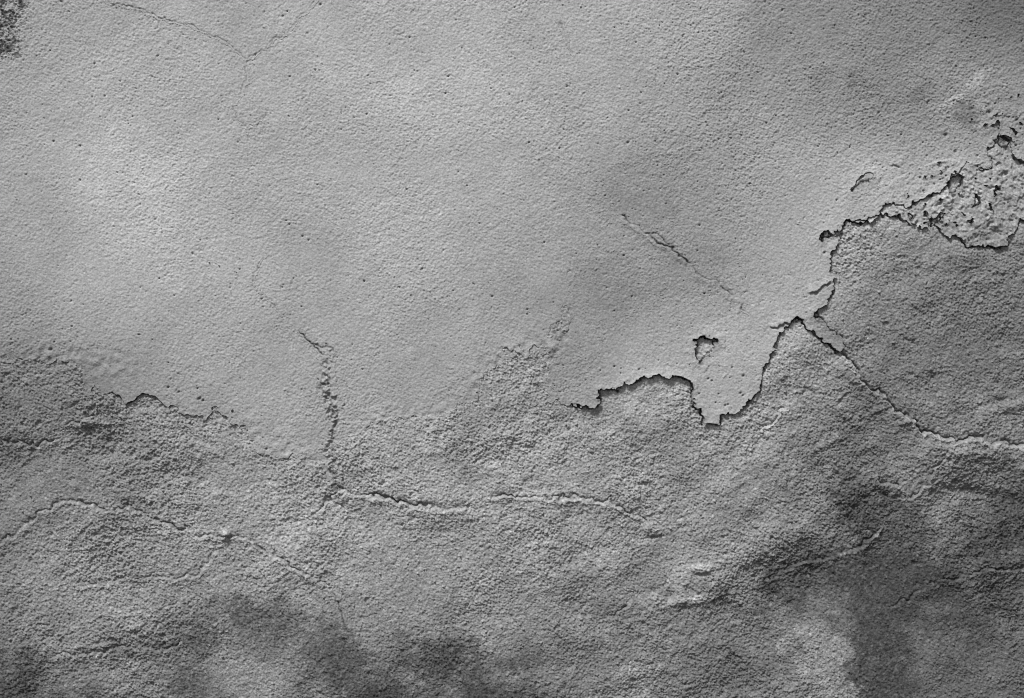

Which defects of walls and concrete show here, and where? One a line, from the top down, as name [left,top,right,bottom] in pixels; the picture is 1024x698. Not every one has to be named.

flaking render [0,316,864,698]
crack [251,255,665,531]
crack [617,211,751,316]
flaking render [787,111,1024,439]
flaking render [880,429,981,530]
flaking render [914,605,1024,698]